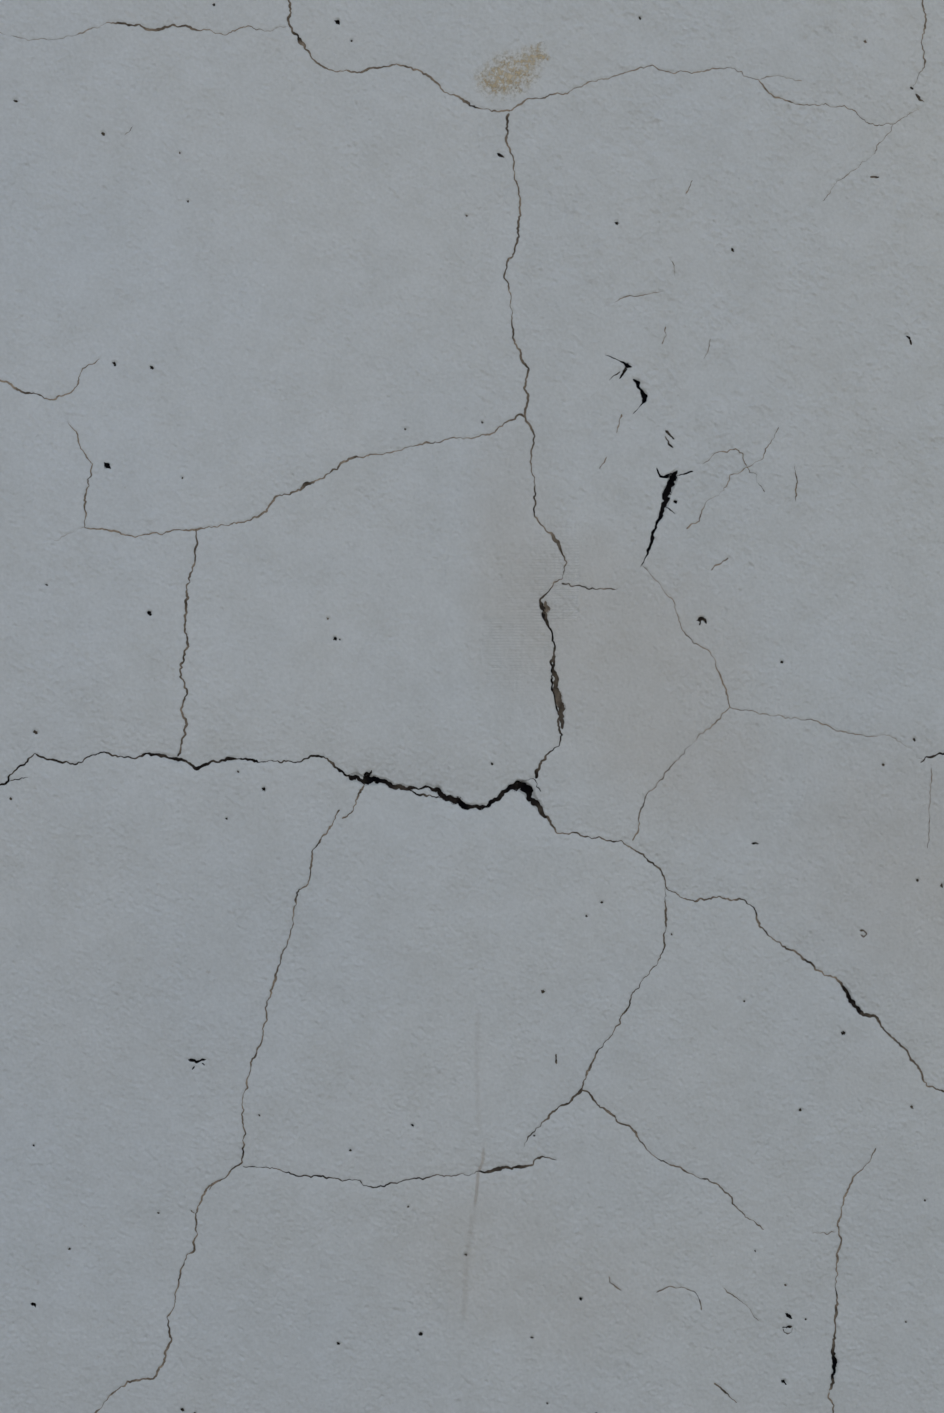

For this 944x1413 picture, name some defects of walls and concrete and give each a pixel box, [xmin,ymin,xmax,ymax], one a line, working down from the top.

crack [0,0,944,1092]
crack [95,810,555,1413]
crack [524,892,764,1230]
crack [657,1286,758,1320]
crack [820,1148,876,1413]